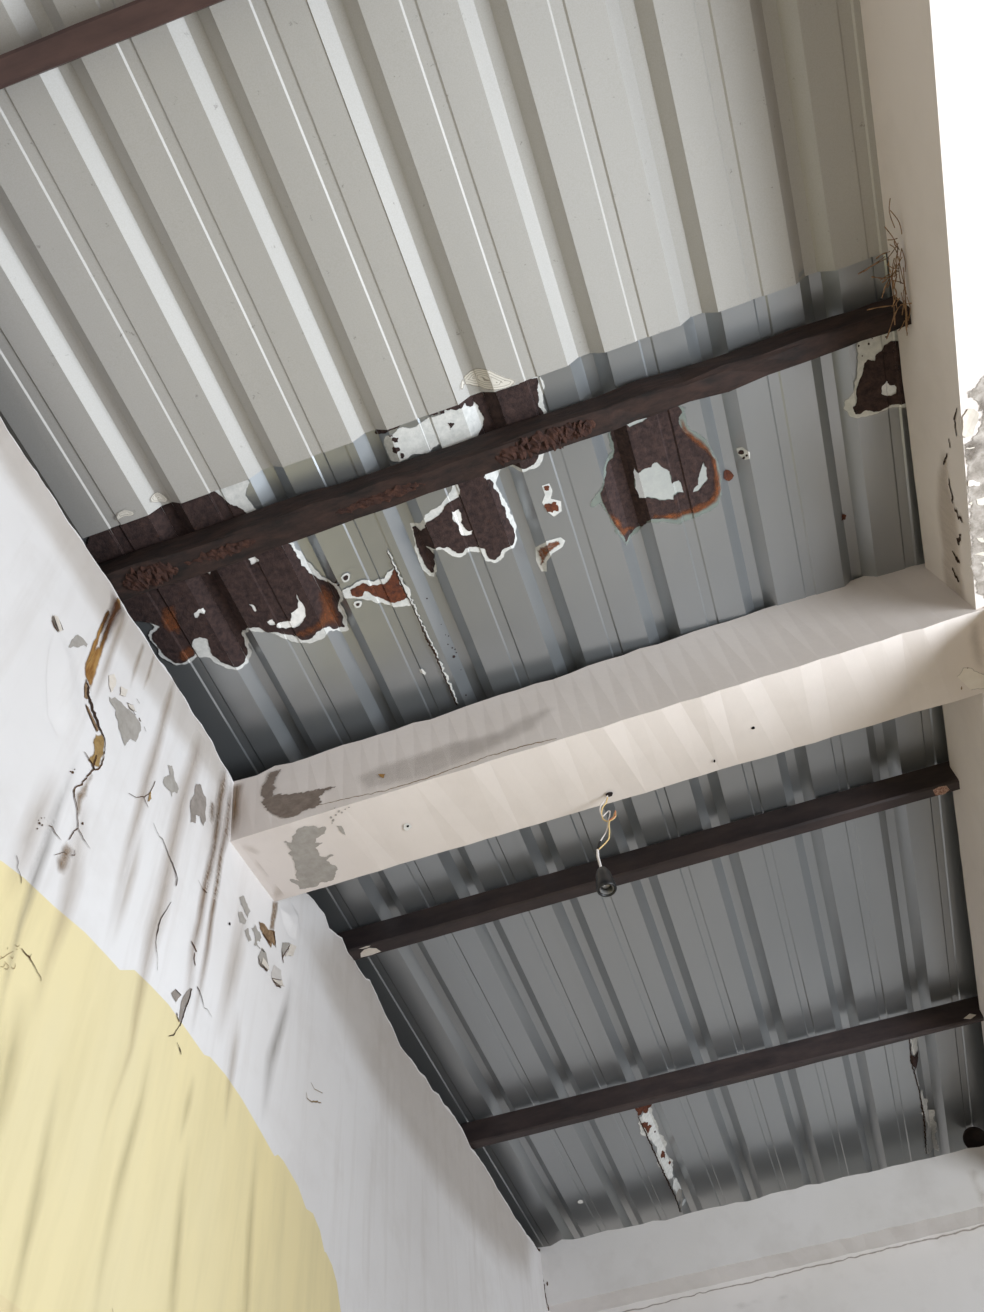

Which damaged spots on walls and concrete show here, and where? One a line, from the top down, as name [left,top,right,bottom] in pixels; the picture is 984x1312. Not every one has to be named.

corrosion [86,480,256,565]
corrosion [375,377,547,462]
corrosion [410,453,544,576]
corrosion [591,406,734,544]
corrosion [843,330,906,419]
peeling [962,376,984,595]
corrosion [85,543,467,705]
crack [49,679,106,856]
peeling [109,674,146,745]
peeling [261,769,350,889]
peeling [239,896,296,988]
corrosion [635,1104,686,1212]